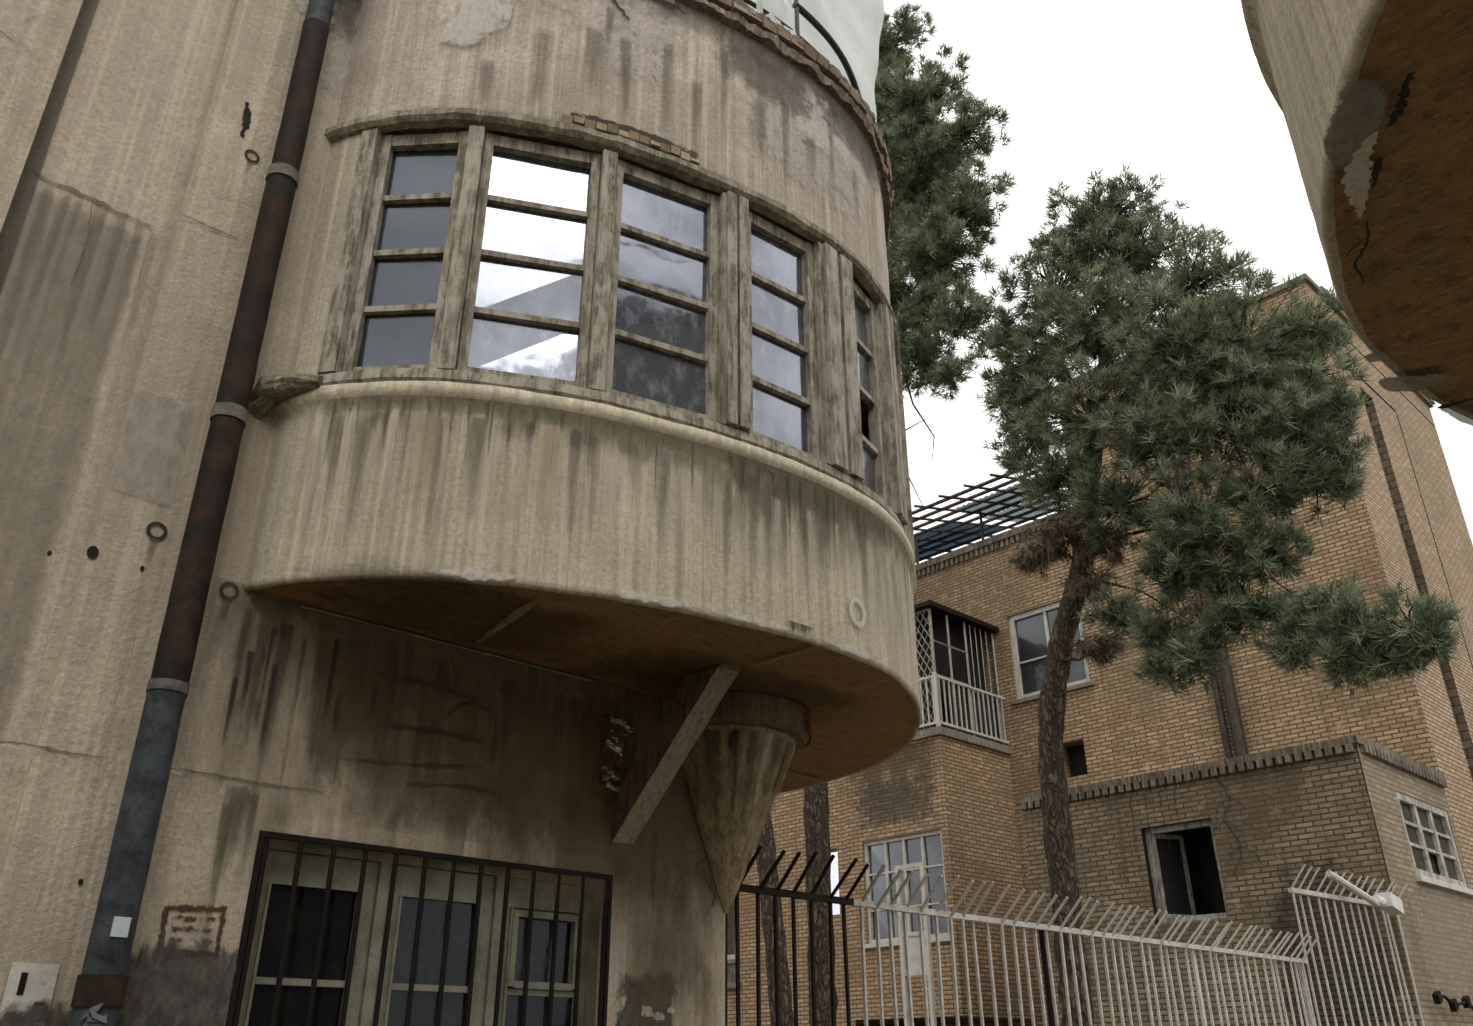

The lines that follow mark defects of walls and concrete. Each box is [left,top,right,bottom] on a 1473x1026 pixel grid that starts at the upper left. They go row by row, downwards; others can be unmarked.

peeling [1324,78,1387,218]
crack [1346,72,1414,284]
peeling [1364,352,1450,392]
peeling [1438,398,1473,426]
damp [329,395,913,571]
damp [212,788,259,890]
damp [224,593,716,1016]
damp [704,729,793,820]
spalling [0,999,72,1026]
spalling [116,939,238,1026]
spalling [616,973,678,1026]